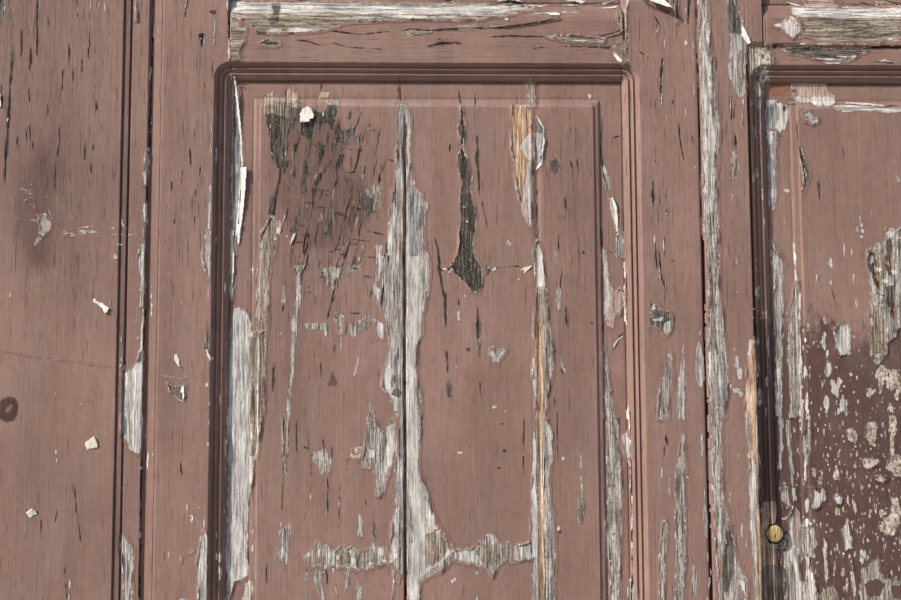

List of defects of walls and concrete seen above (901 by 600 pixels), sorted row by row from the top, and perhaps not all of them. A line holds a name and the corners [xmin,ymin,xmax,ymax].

peeling [113,22,154,600]
peeling [133,0,154,23]
peeling [159,354,190,403]
peeling [180,0,631,600]
peeling [599,125,639,600]
peeling [647,0,901,600]